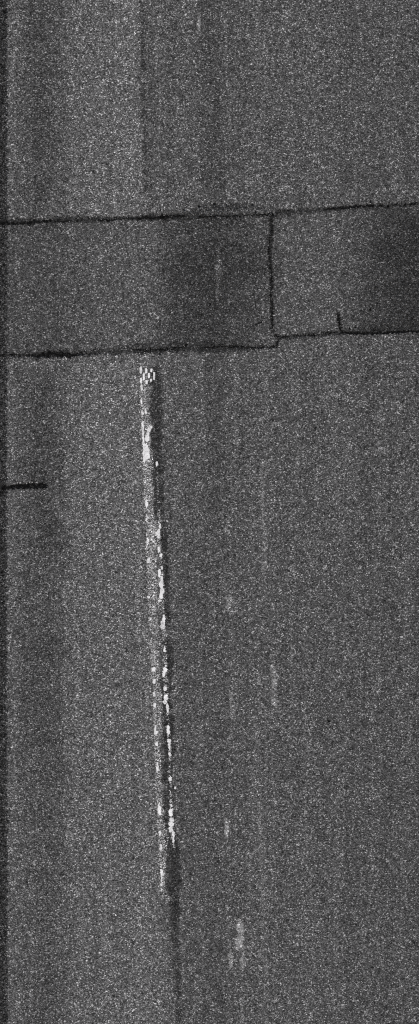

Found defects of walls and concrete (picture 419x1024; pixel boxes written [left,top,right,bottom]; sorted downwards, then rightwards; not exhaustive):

crack [0,200,419,360]
crack [1,481,47,491]
damp [149,365,171,625]
damp [161,640,182,1024]